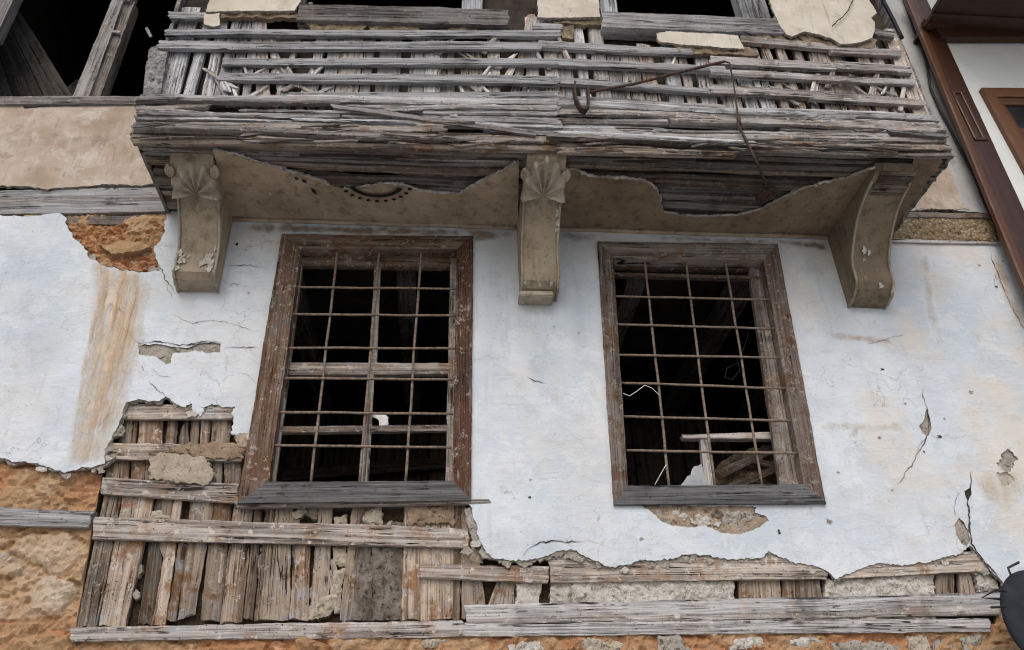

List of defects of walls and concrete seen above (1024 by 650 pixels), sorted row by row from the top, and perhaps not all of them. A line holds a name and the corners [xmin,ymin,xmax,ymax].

spalling [72,222,165,273]
water stain [75,269,142,459]
spalling [138,343,221,365]
spalling [0,397,222,479]
crack [897,394,939,485]
spalling [919,412,942,438]
spalling [997,450,1017,486]
spalling [460,506,777,574]
spalling [922,519,990,577]
crack [949,473,1002,581]